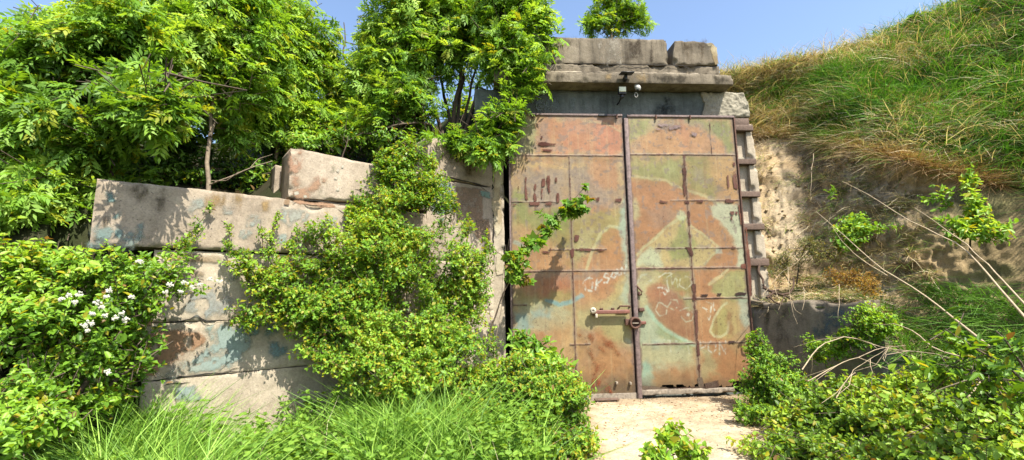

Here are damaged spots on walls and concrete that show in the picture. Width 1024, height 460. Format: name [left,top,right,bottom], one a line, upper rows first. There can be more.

corrosion [570,230,604,258]
corrosion [682,168,703,256]
corrosion [725,199,752,298]
corrosion [642,281,722,390]